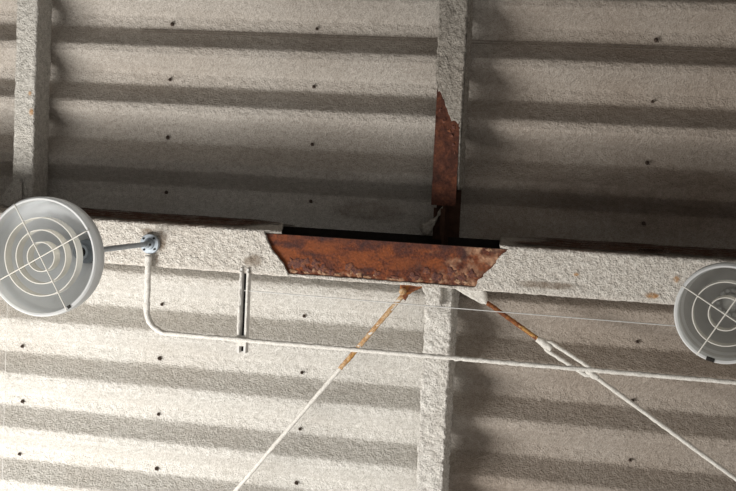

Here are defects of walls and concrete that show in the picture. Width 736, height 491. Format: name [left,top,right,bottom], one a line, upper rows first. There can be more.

rust [338,295,403,370]
rust [486,301,538,340]